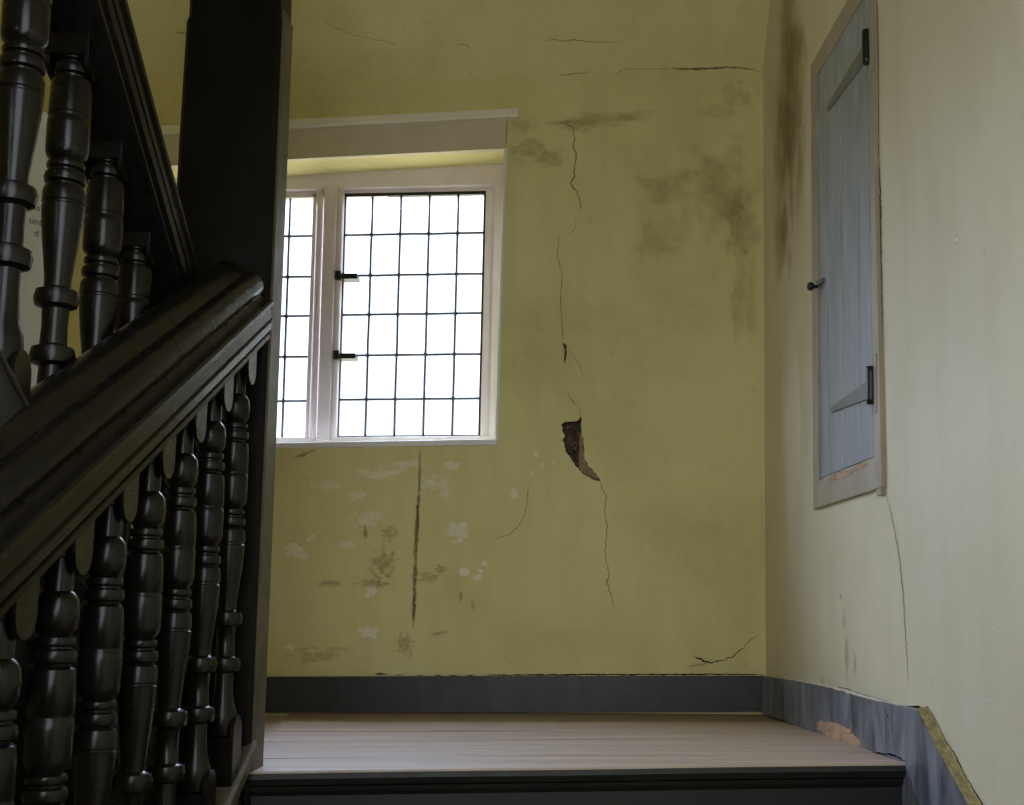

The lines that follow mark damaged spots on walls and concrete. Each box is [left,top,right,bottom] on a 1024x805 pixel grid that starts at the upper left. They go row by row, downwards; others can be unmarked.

crack [620,65,759,73]
crack [557,122,583,416]
spalling [561,417,600,481]
crack [598,479,613,603]
crack [885,495,908,674]
crack [684,637,755,668]
peeling [816,720,861,746]